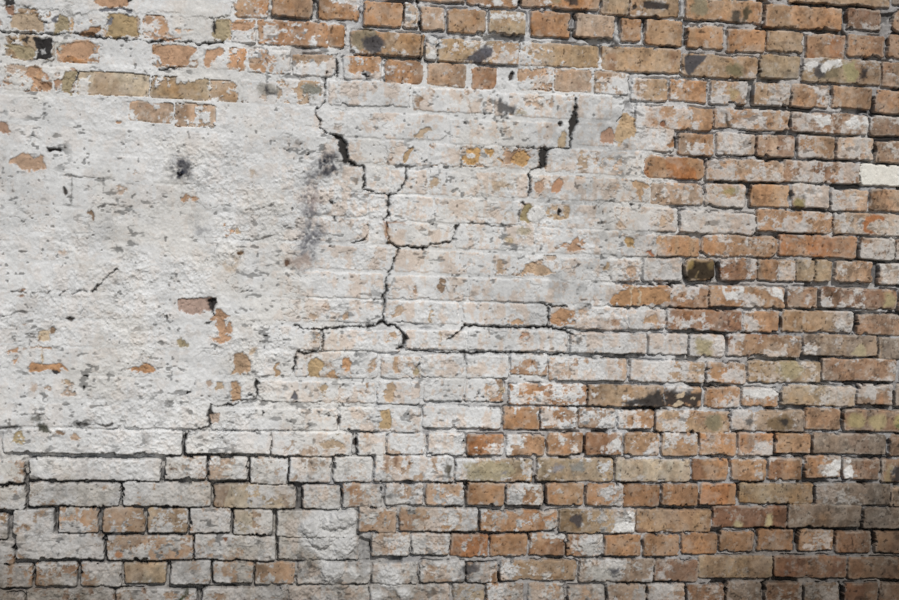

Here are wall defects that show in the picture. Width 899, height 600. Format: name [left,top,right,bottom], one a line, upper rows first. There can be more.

spalling [0,0,256,97]
crack [291,53,579,374]
spalling [175,337,191,351]
spalling [165,296,234,344]
spalling [204,345,259,404]
spalling [208,413,222,424]